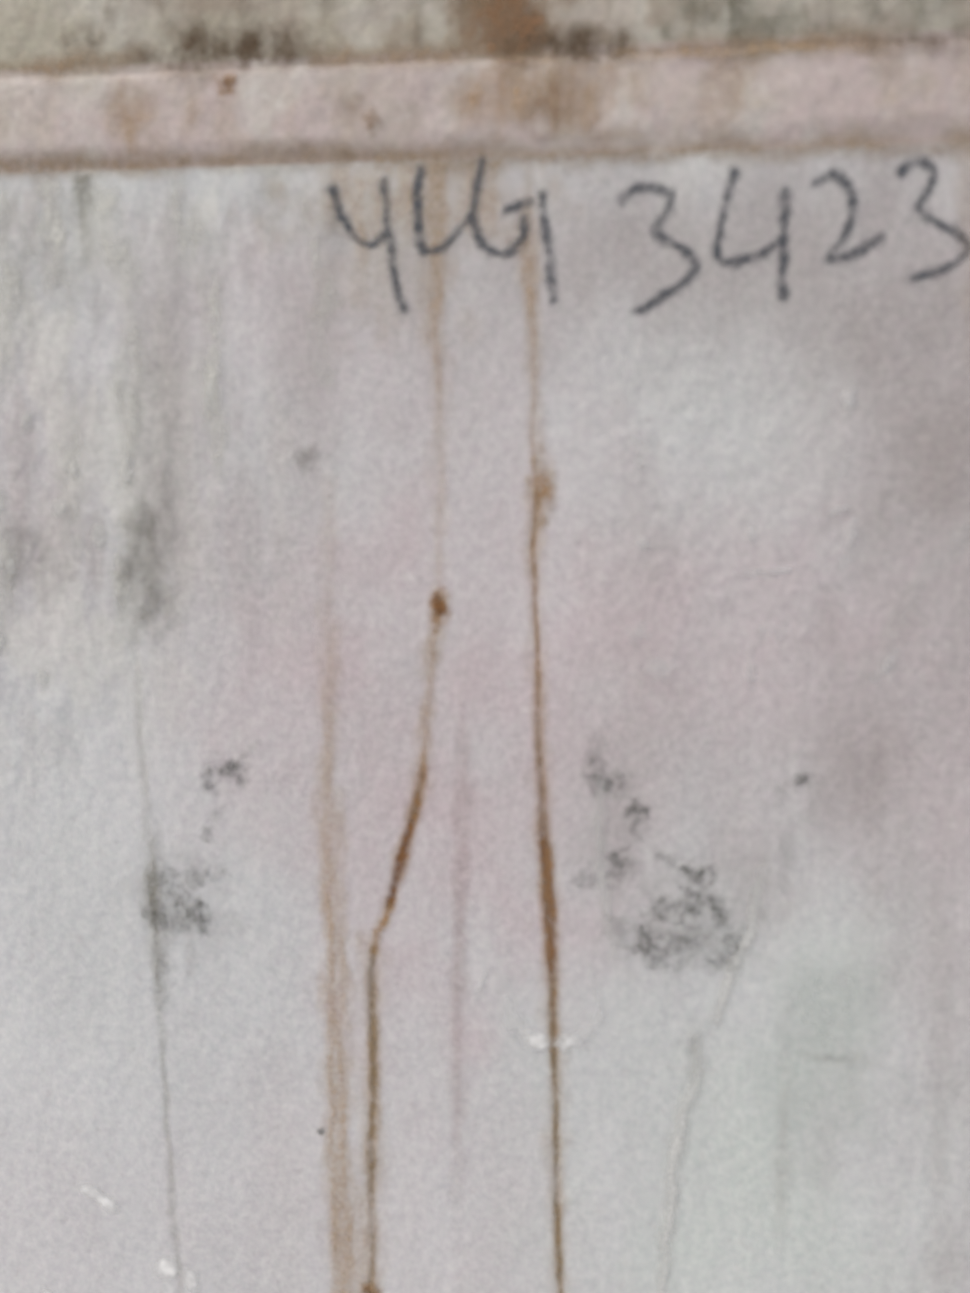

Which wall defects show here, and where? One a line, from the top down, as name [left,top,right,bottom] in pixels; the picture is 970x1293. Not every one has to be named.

damp [182,28,294,63]
damp [377,30,594,63]
damp [676,0,843,56]
rust [431,592,447,621]